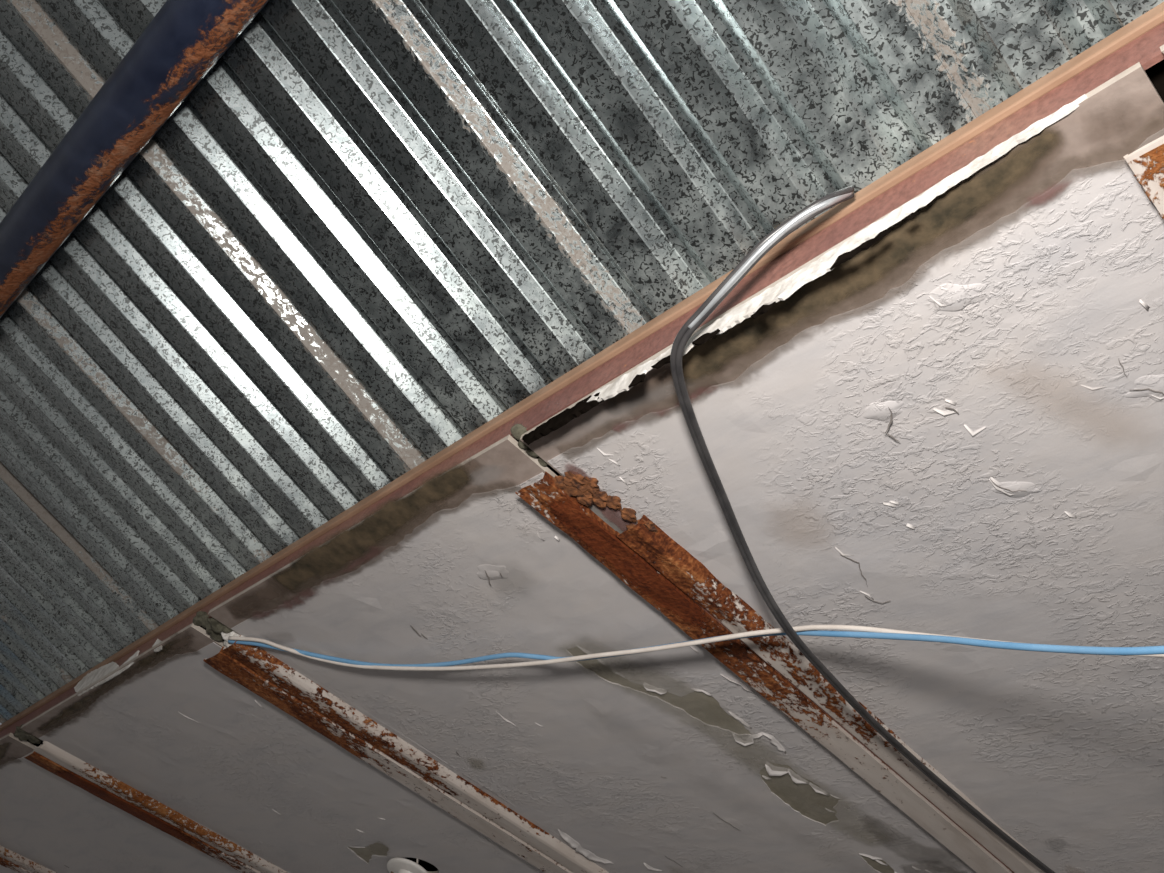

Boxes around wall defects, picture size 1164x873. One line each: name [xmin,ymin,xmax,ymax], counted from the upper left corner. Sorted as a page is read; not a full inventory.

rust [0,0,267,316]
rust [1128,144,1164,219]
spalling [628,354,671,388]
spalling [692,329,720,346]
spalling [751,302,776,319]
spalling [830,228,892,270]
damp [560,119,1164,456]
peeling [933,399,986,436]
rust [515,465,949,796]
rust [25,751,288,873]
rust [203,635,561,871]
peeling [568,646,843,825]